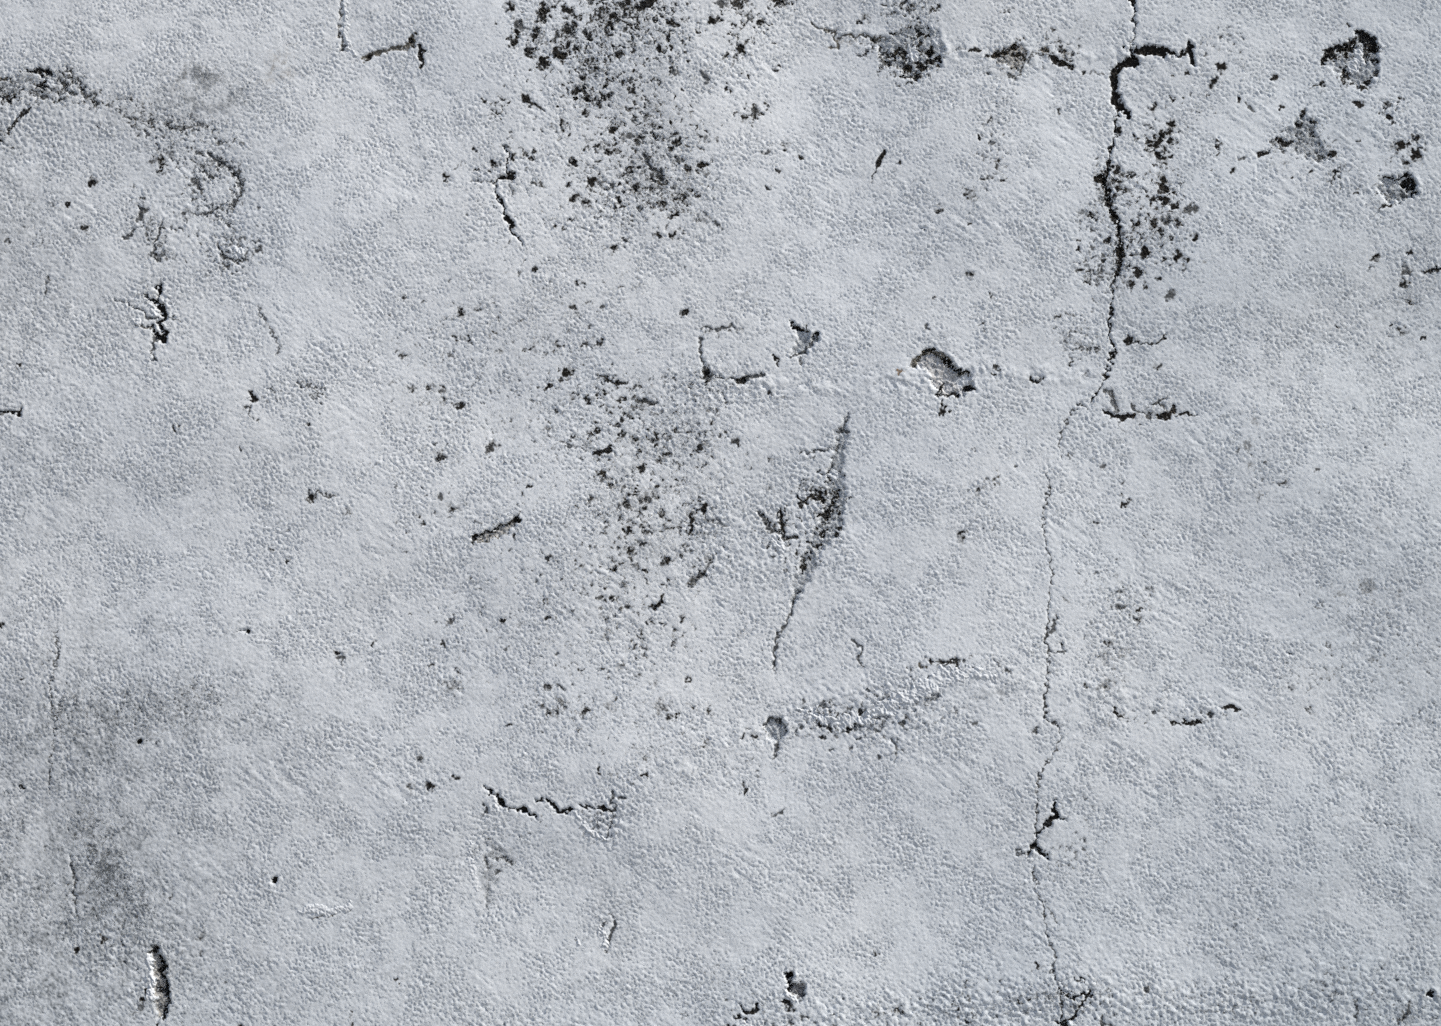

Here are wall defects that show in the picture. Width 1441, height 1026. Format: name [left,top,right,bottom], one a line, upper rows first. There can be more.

spalling [1309,23,1404,122]
spalling [896,347,976,416]
crack [1016,0,1195,1026]
crack [482,786,627,842]
spalling [133,946,171,1026]